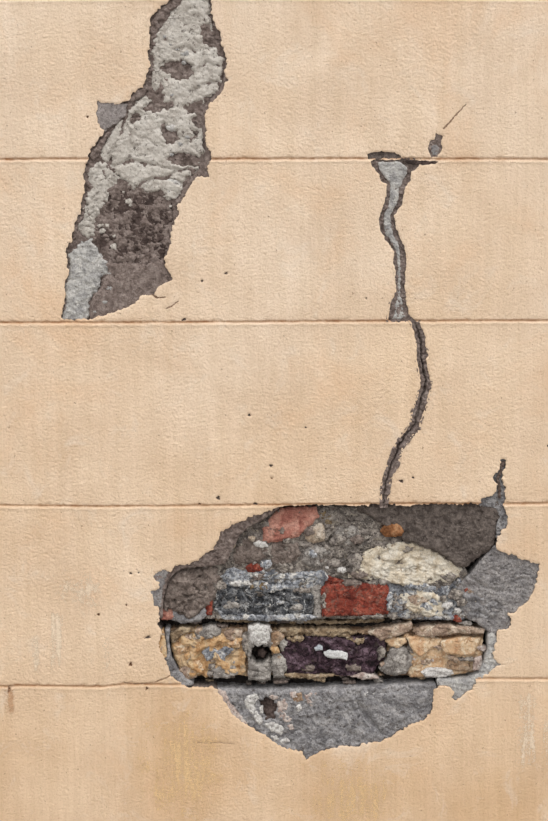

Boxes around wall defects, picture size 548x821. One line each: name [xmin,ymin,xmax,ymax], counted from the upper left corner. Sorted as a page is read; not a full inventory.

crack [367,151,438,508]
spalling [145,459,539,759]